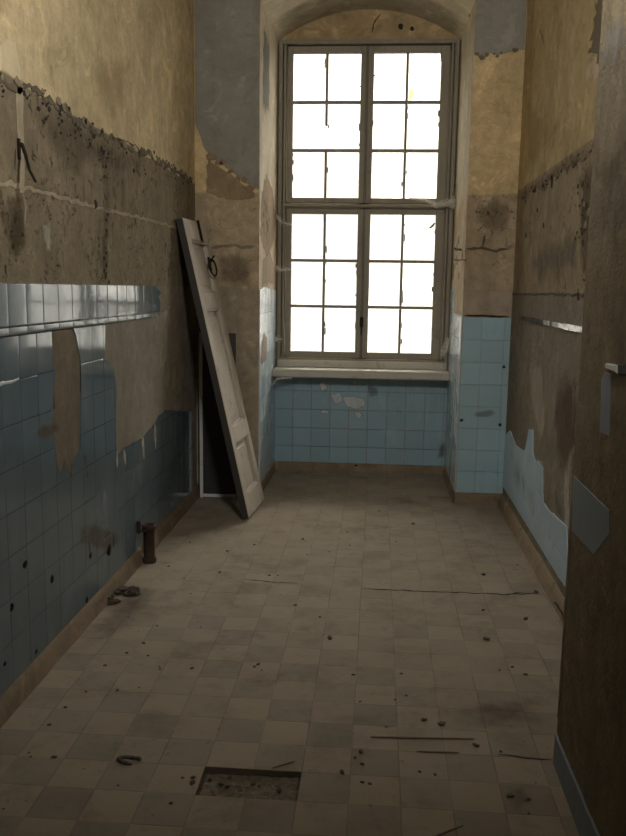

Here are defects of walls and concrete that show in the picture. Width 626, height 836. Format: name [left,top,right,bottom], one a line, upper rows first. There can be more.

flaking render [0,40,193,185]
peeling [585,0,603,81]
flaking render [521,141,594,281]
peeling [51,329,89,479]
peeling [103,305,170,467]
peeling [198,774,300,801]